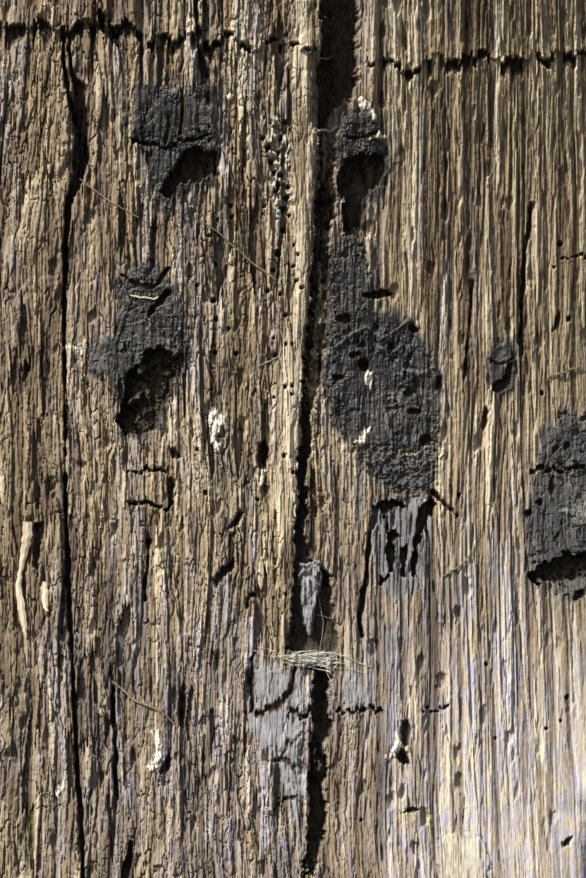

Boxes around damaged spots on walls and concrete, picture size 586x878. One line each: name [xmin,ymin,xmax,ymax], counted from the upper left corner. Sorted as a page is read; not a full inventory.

spalling [362,289,393,300]
spalling [335,313,352,325]
peeling [349,340,376,391]
peeling [124,391,143,410]
spalling [403,388,420,415]
crack [0,0,251,878]
crack [244,0,586,878]
spalling [524,475,556,518]
spalling [573,588,586,601]